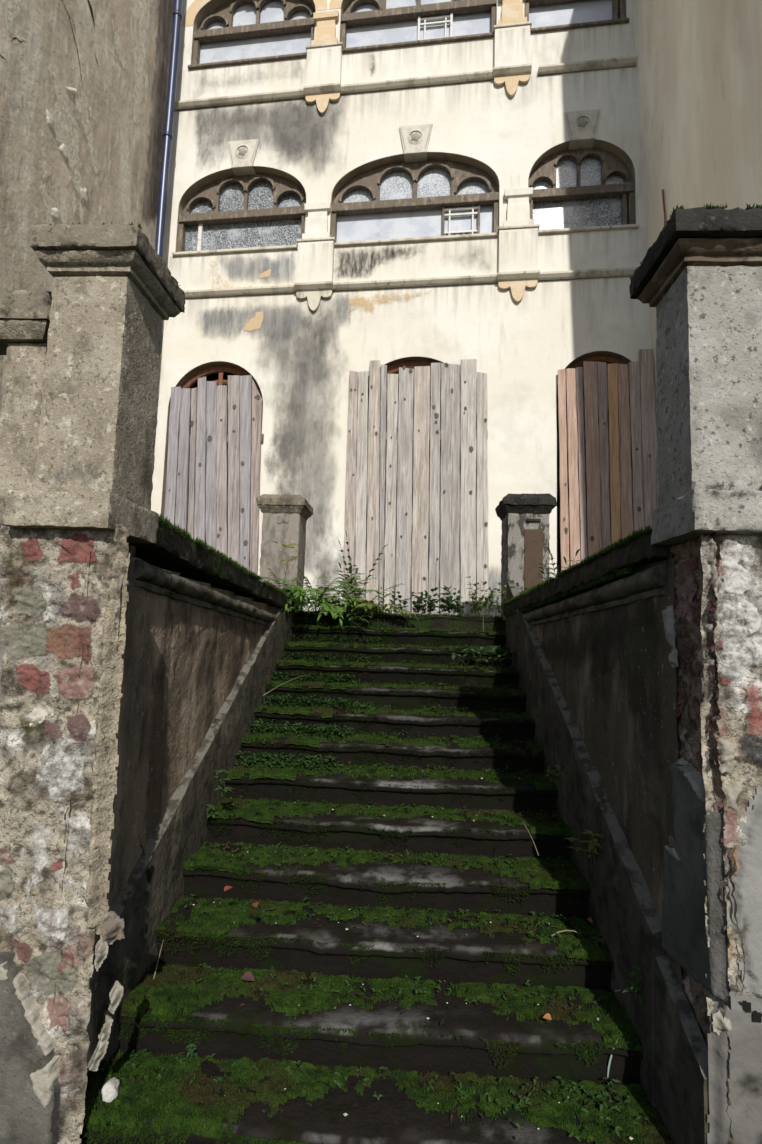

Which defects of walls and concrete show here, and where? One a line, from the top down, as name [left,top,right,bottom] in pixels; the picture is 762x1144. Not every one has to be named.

water stain [198,100,339,170]
peeling [243,311,264,331]
water stain [338,248,411,276]
water stain [204,299,350,594]
spalling [0,524,129,1144]
spalling [662,533,762,1144]
crack [729,847,745,994]